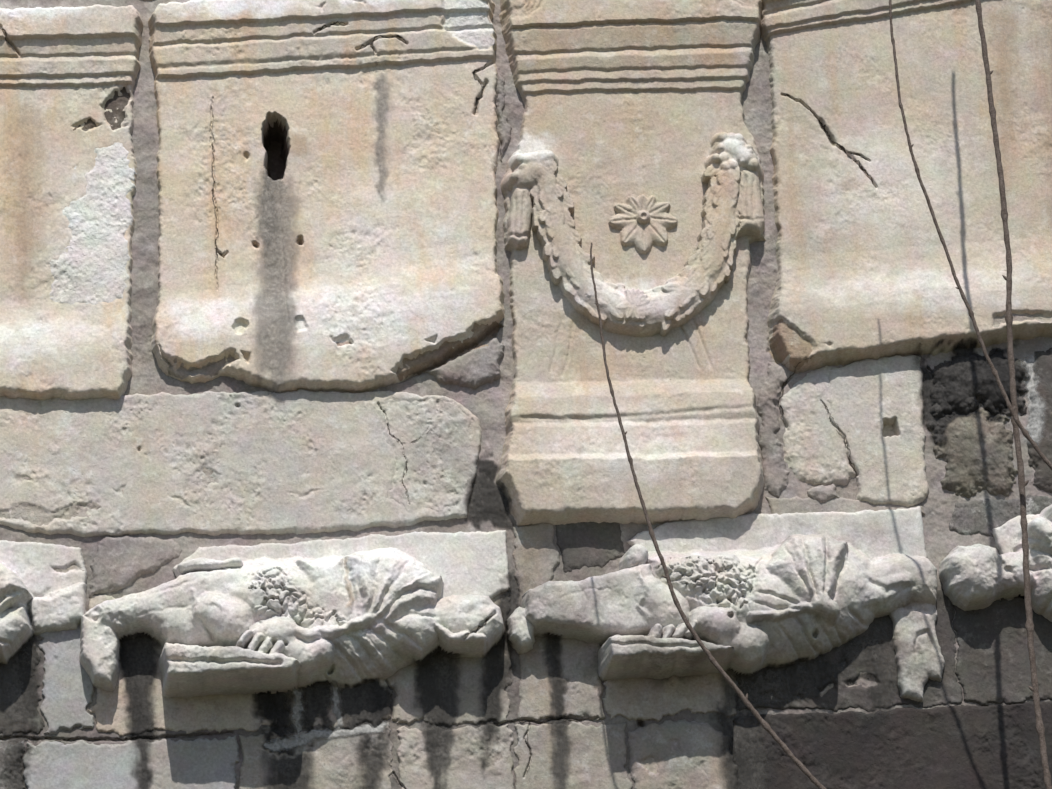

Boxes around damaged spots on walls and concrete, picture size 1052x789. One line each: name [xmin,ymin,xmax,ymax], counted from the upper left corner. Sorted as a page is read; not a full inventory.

spalling [39,87,137,305]
crack [210,109,225,275]
crack [360,35,404,51]
crack [472,60,490,112]
crack [784,93,873,184]
leakage [257,170,295,391]
crack [778,358,811,423]
leakage [119,632,160,789]
leakage [253,679,393,789]
leakage [415,645,460,789]
leakage [480,572,519,741]
leakage [544,633,569,789]